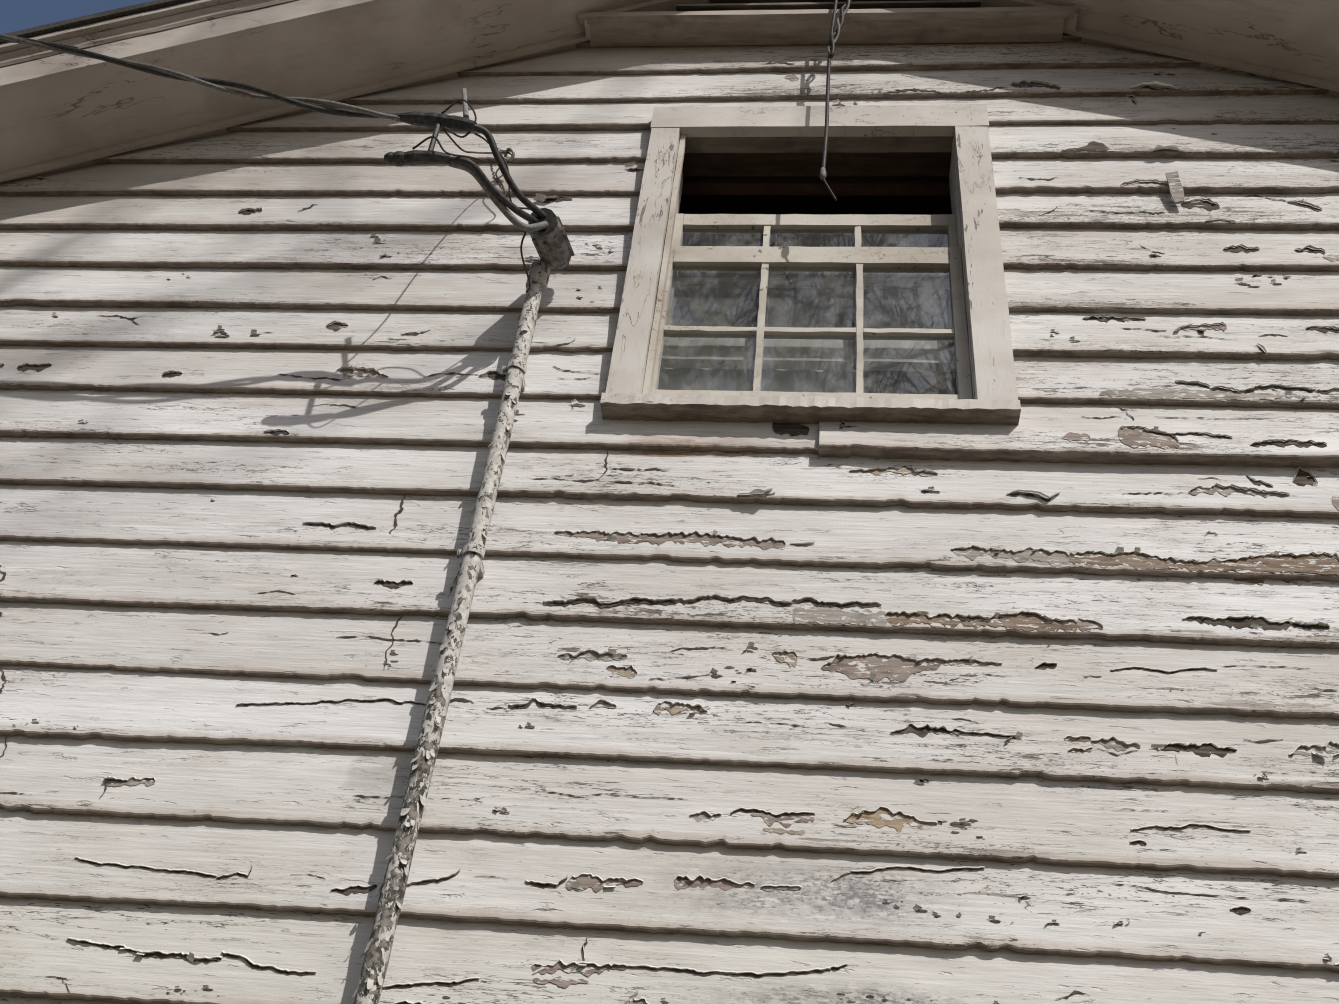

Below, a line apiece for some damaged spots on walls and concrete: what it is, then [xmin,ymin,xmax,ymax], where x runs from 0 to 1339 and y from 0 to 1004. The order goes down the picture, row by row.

peeling [1118,426,1180,449]
peeling [951,545,1339,586]
peeling [793,604,1103,632]
peeling [822,652,1003,682]
peeling [1064,735,1237,757]
peeling [1289,741,1339,758]
peeling [844,806,982,838]
crack [75,856,253,879]
peeling [566,873,644,892]
crack [222,950,317,976]
peeling [532,959,628,988]